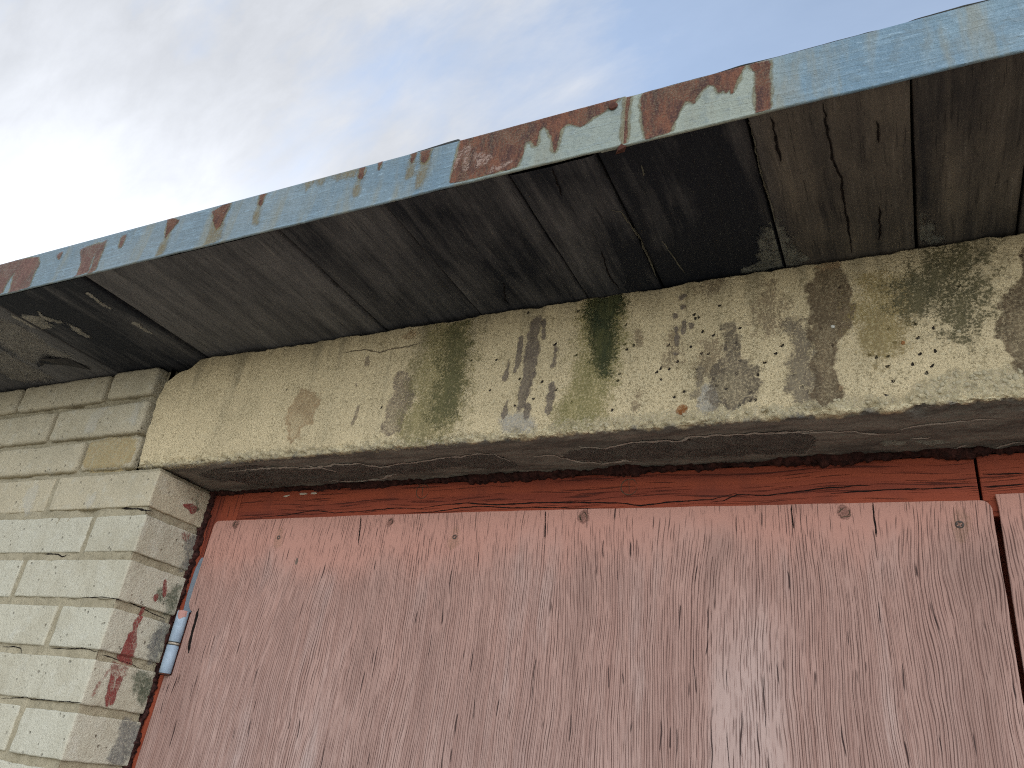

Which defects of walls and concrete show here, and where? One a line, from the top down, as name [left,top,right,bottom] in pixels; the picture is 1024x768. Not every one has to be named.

corrosion [450,60,774,183]
crack [770,117,782,162]
crack [823,104,852,253]
corrosion [0,257,40,294]
corrosion [75,242,105,276]
corrosion [158,218,179,255]
corrosion [205,203,232,244]
crack [875,208,883,240]
damp [741,220,920,407]
damp [995,248,1024,374]
damp [690,322,764,414]